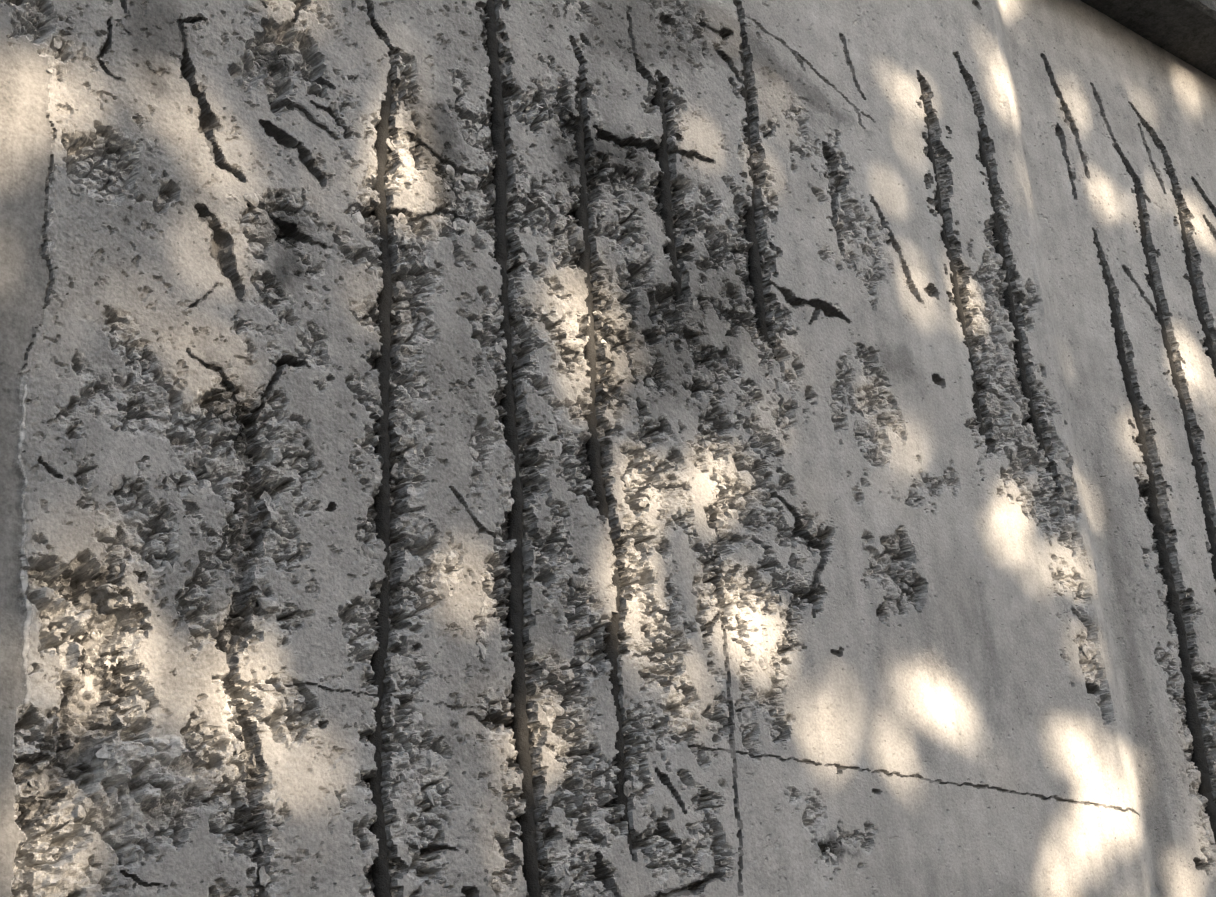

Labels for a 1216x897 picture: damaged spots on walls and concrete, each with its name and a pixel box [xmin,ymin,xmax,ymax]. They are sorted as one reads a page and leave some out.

crack [20,113,57,371]
spalling [52,116,182,231]
spalling [10,304,337,897]
spalling [219,0,961,897]
crack [566,492,1140,897]
spalling [948,188,1116,726]
spalling [1133,462,1216,878]